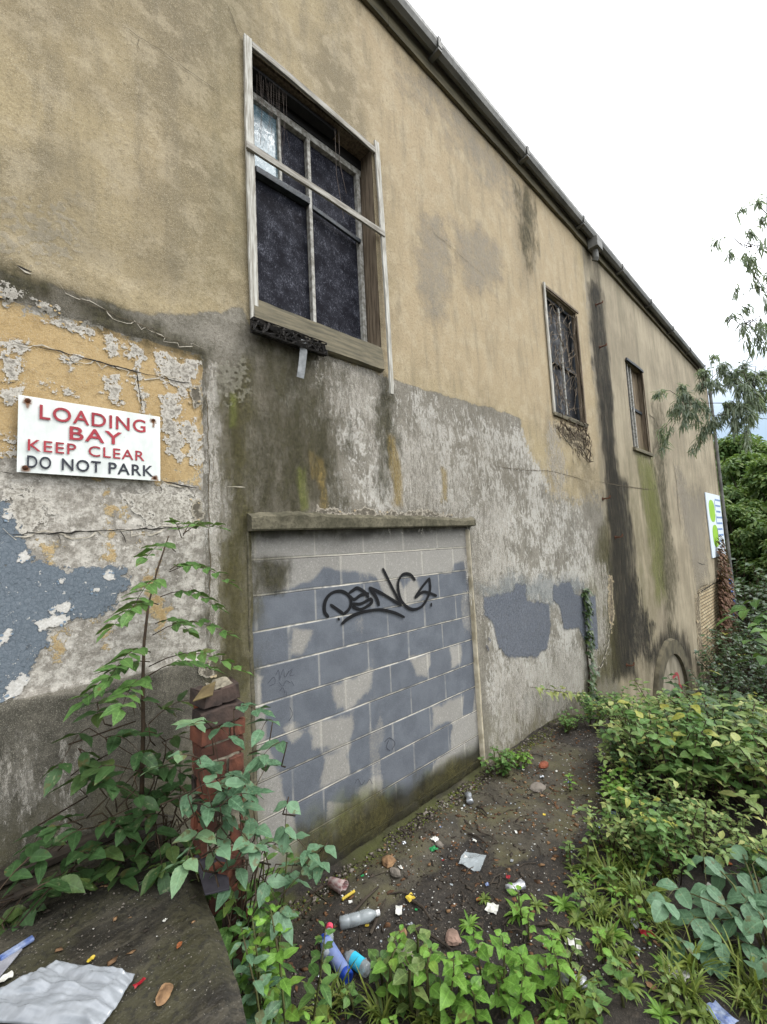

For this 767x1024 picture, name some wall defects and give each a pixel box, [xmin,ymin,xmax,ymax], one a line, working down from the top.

leakage [515,187,537,250]
leakage [3,272,46,292]
peeling [0,280,206,470]
crack [3,265,240,640]
peeling [0,482,57,537]
peeling [121,483,205,532]
leakage [198,342,516,677]
leakage [487,282,692,744]
peeling [17,550,30,563]
peeling [0,628,14,647]
peeling [34,600,75,632]
peeling [4,672,31,700]